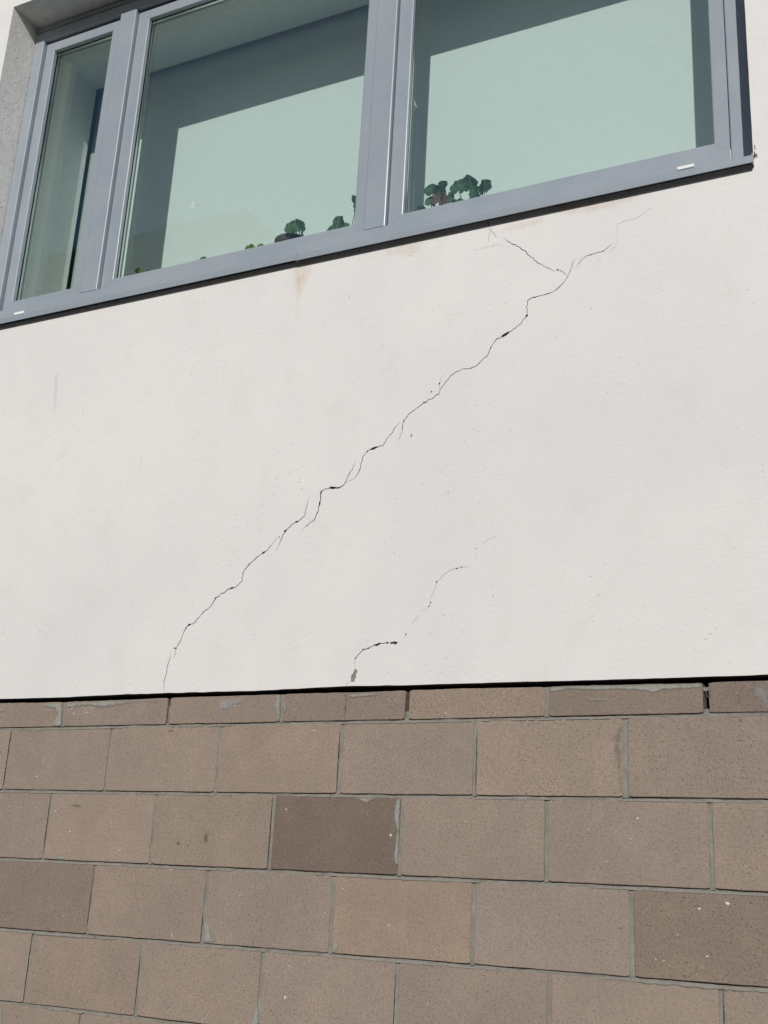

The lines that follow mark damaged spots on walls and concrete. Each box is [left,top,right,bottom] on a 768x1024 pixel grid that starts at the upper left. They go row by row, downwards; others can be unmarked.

crack [164,208,651,689]